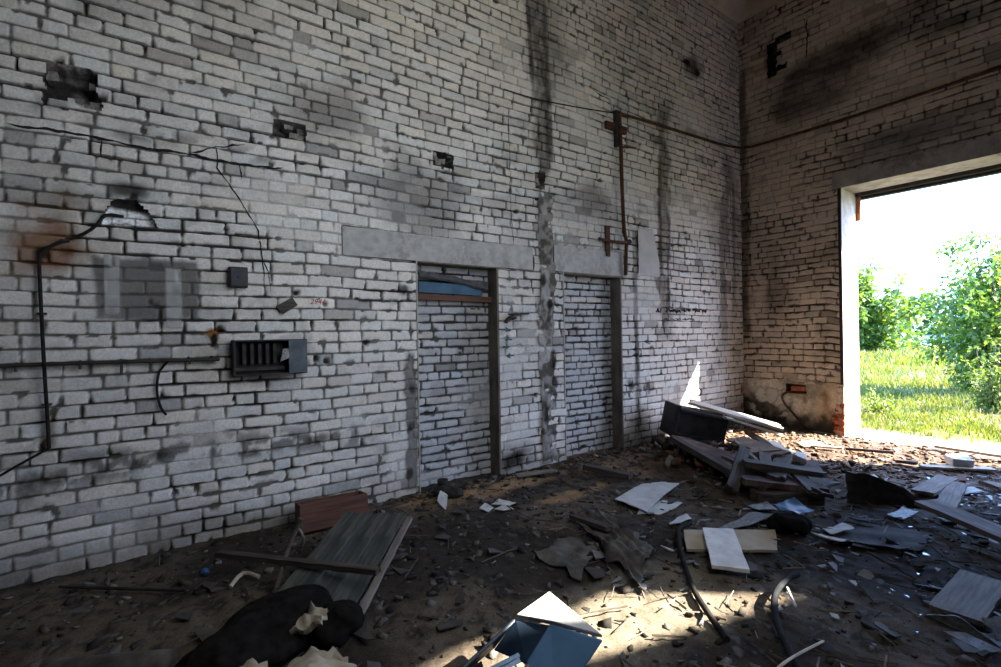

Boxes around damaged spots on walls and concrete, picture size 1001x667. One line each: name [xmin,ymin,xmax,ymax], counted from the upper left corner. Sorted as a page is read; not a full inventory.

spalling [39,61,105,111]